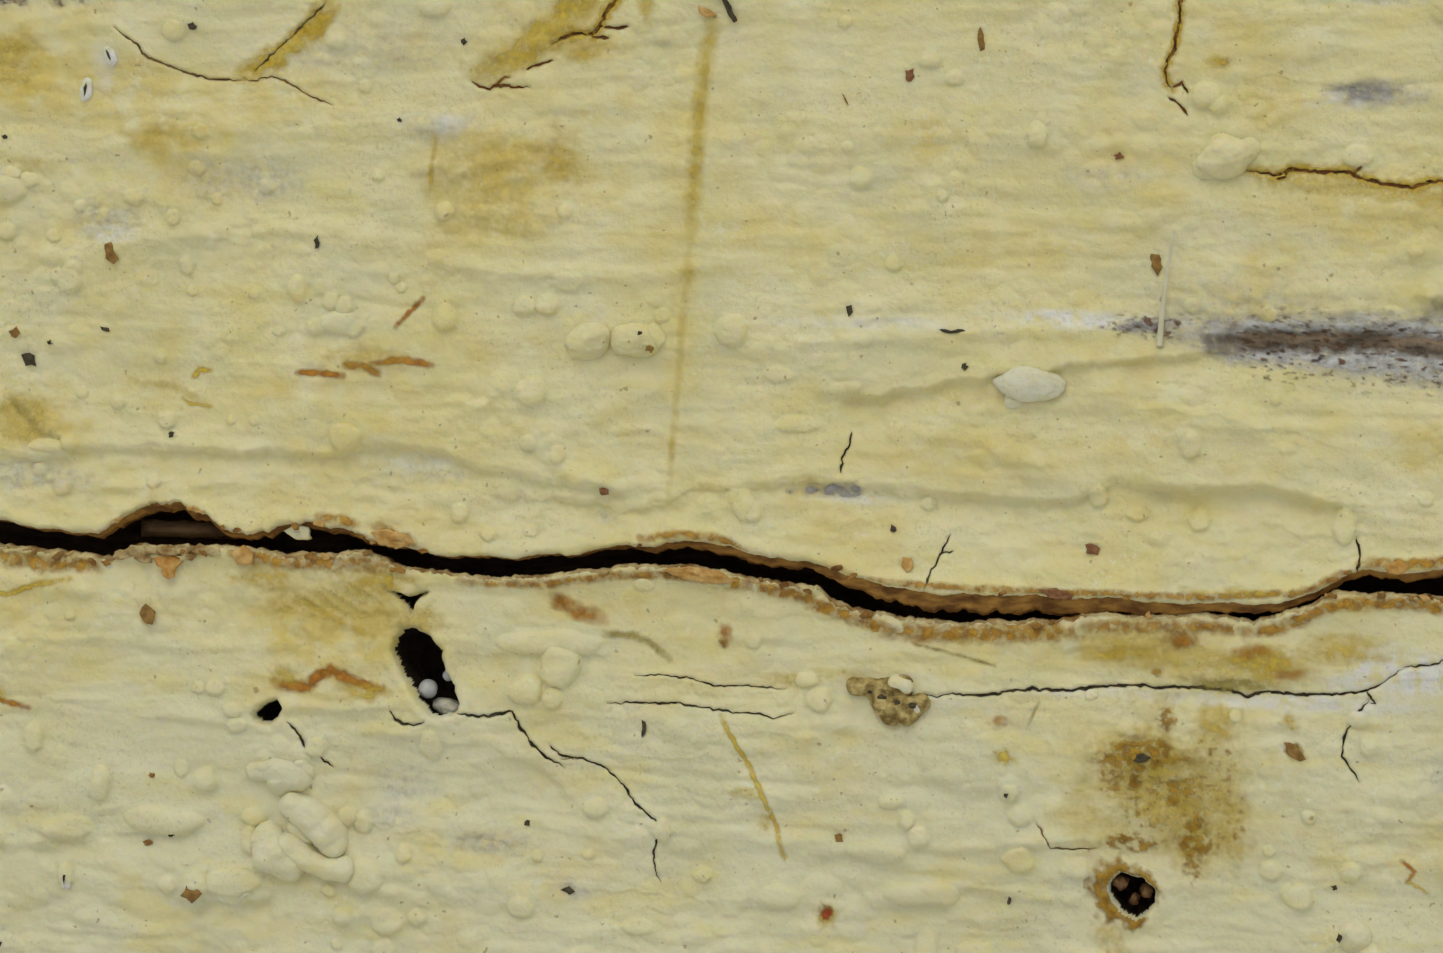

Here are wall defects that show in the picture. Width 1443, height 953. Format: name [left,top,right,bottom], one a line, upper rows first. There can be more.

crack [114,4,331,105]
crack [472,0,629,90]
crack [1162,0,1188,115]
crack [1246,164,1443,192]
crack [840,432,852,473]
crack [0,502,1443,642]
crack [390,711,424,726]
crack [607,673,793,719]
crack [929,660,1443,780]
crack [457,710,661,882]
crack [1036,823,1094,850]